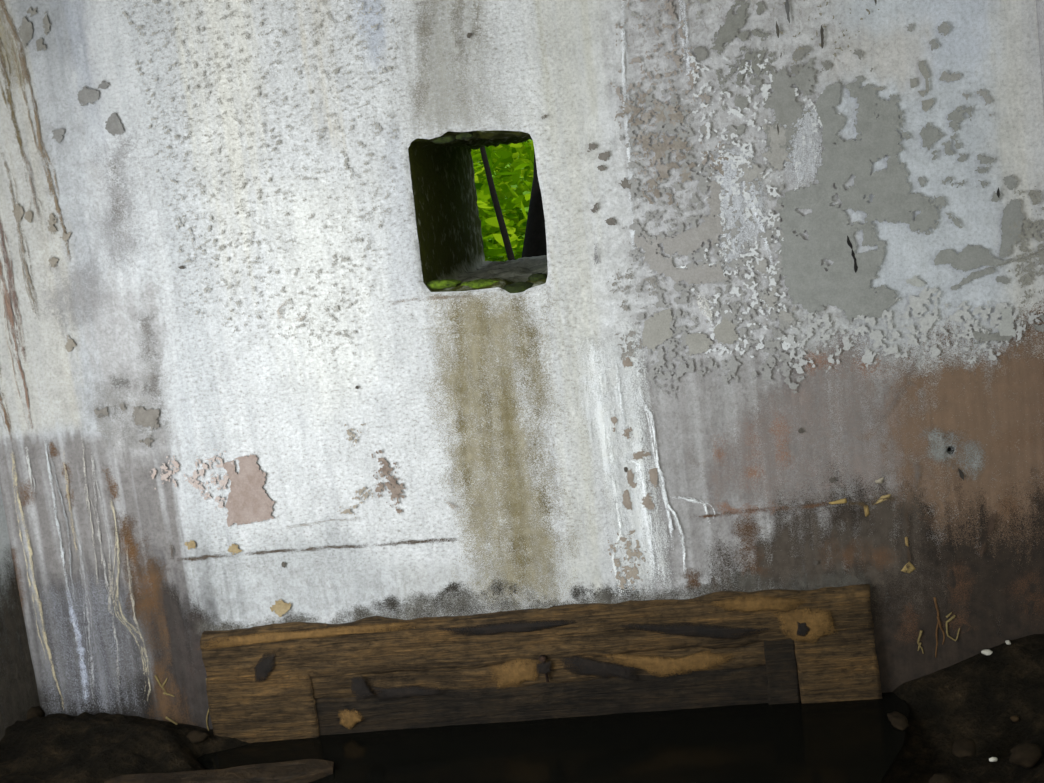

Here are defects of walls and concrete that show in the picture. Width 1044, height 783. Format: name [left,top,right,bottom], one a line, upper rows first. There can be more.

rust [0,0,70,437]
damp [30,131,150,342]
damp [620,1,634,179]
damp [678,0,692,80]
damp [709,146,774,275]
damp [773,103,823,187]
peeling [587,0,1044,400]
peeling [150,449,275,527]
flaking render [337,450,406,518]
damp [0,285,1044,741]
rust [678,297,1044,577]